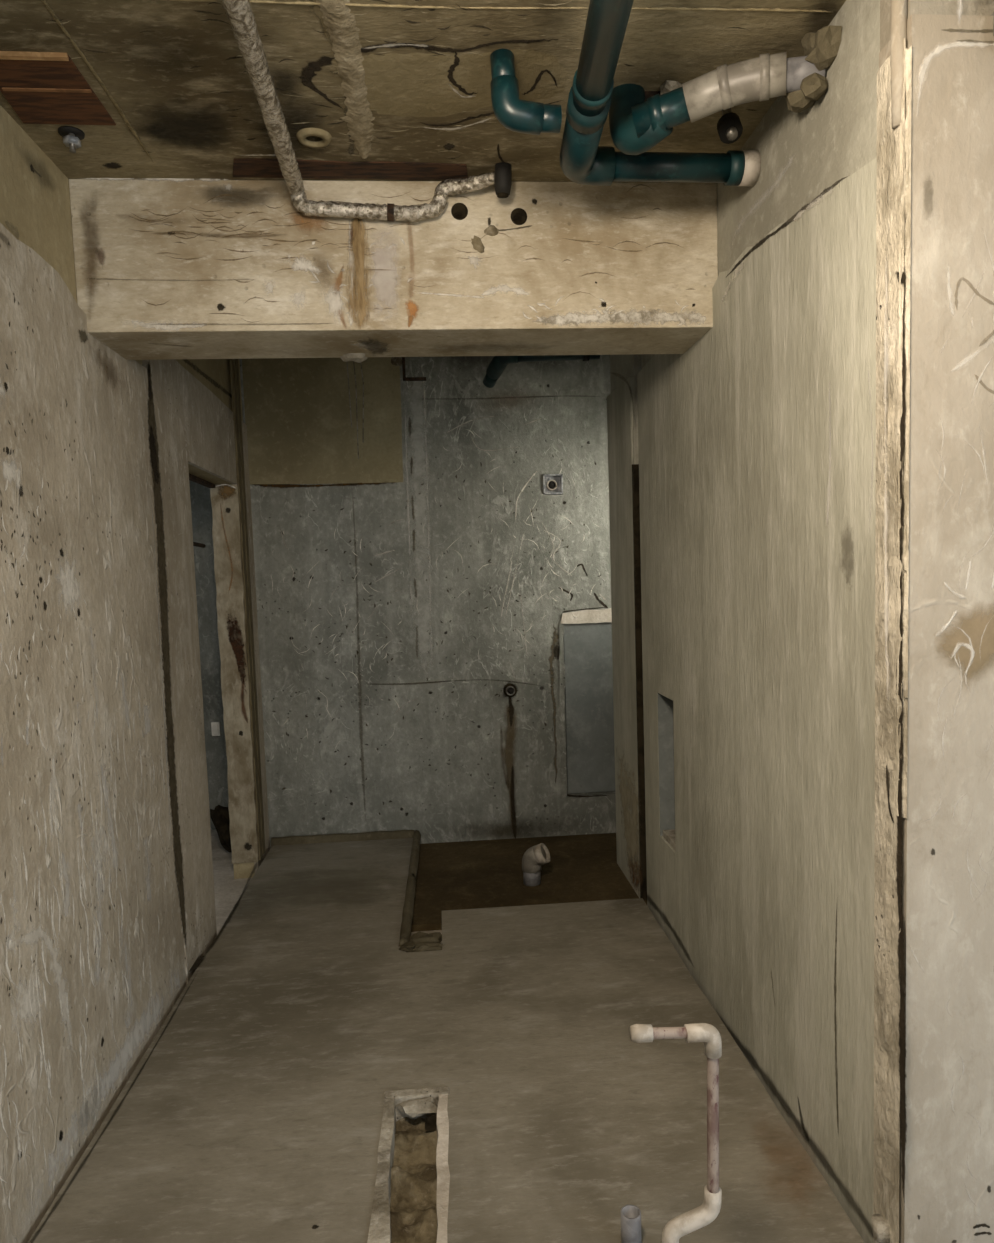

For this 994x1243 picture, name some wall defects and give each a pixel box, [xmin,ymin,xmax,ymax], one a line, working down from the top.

crack [299,39,562,163]
rust [227,614,248,723]
damp [940,610,994,678]
rust [503,683,518,838]